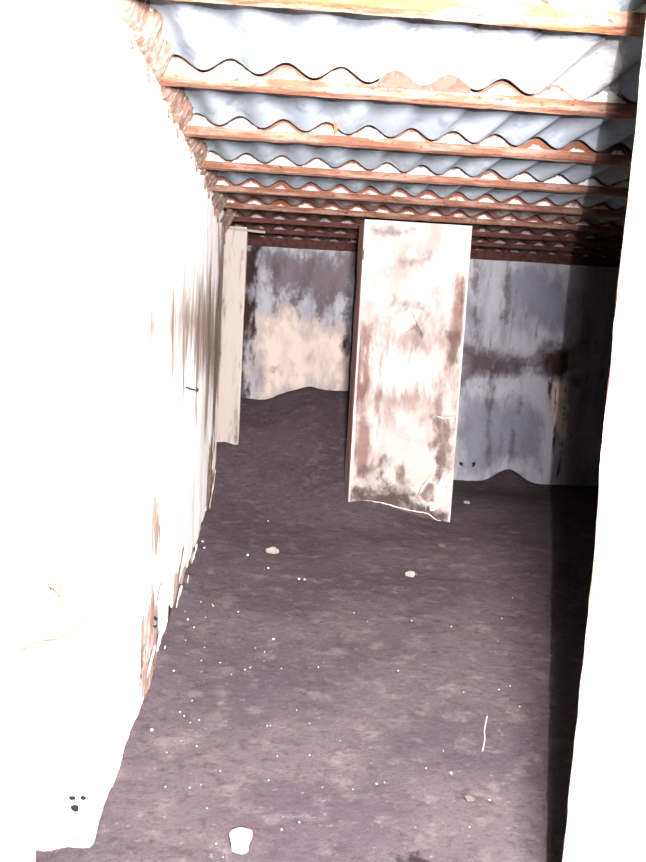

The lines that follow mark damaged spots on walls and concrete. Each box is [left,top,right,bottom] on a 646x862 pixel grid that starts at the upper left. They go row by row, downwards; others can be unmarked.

damp [241,246,357,398]
damp [502,268,567,330]
damp [365,344,438,394]
damp [460,344,579,386]
damp [590,133,646,658]
damp [352,429,447,521]
damp [432,416,450,478]
damp [462,402,540,471]